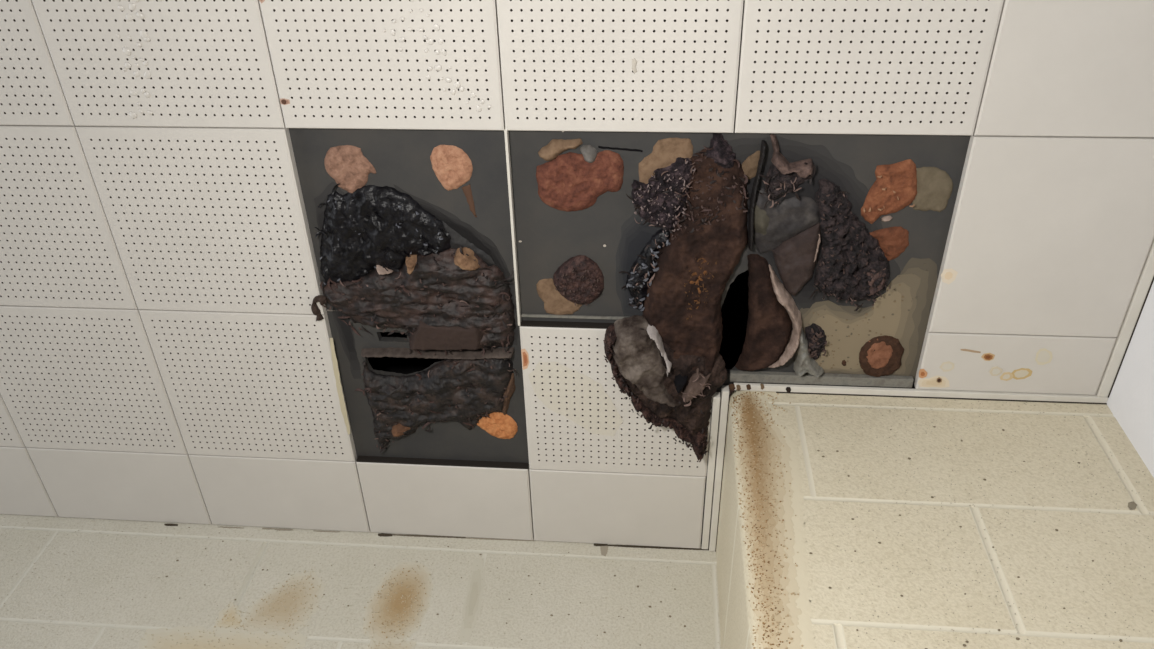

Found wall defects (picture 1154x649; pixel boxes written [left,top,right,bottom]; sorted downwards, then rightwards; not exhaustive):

spalling [671,133,749,240]
leakage [730,392,815,649]
leakage [139,569,327,649]
leakage [363,561,434,649]